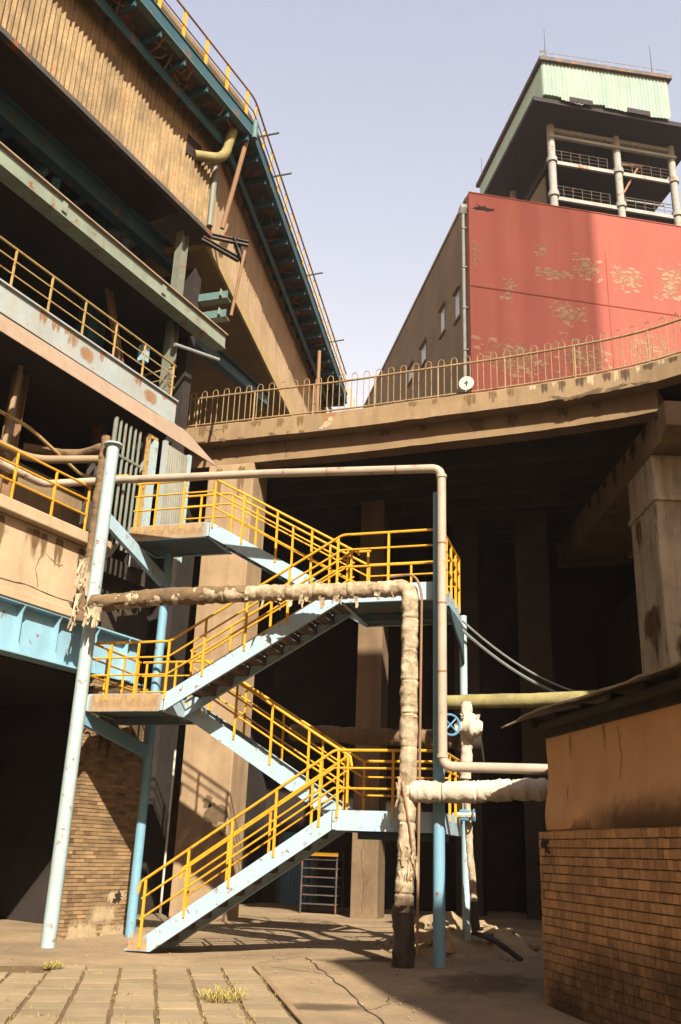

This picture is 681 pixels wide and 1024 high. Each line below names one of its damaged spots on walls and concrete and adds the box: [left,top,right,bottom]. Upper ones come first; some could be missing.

peeling [533,242,681,302]
corrosion [40,312,104,362]
peeling [471,300,675,378]
corrosion [136,377,167,403]
crack [0,550,74,603]
damp [645,607,661,661]